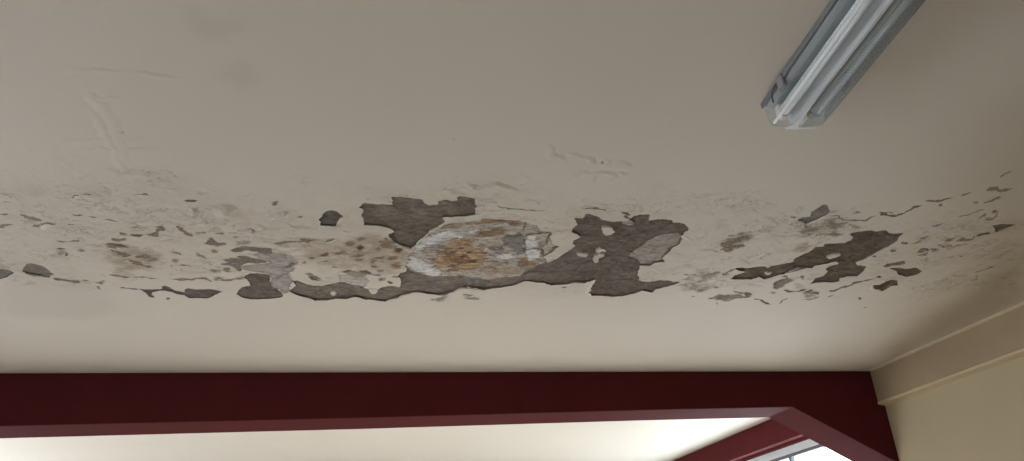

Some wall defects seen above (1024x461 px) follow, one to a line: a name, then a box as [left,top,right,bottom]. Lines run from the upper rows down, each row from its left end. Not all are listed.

spalling [0,263,52,279]
water stain [108,244,156,279]
water stain [173,249,230,282]
spalling [140,196,689,302]
corrosion [304,219,547,281]
water stain [406,219,558,300]
water stain [720,233,749,252]
water stain [801,212,877,235]
spalling [709,171,1014,308]